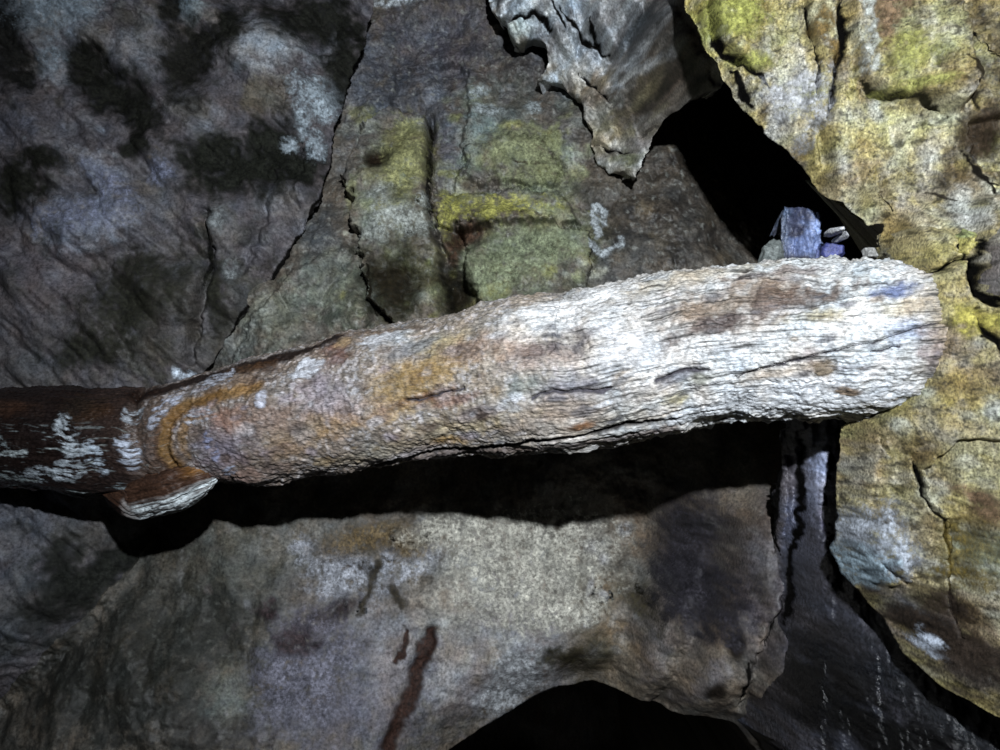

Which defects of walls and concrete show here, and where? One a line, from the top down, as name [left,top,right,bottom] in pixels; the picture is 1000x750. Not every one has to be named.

crack [203,210,213,286]
crack [271,136,334,280]
crack [227,305,250,338]
crack [911,458,958,606]